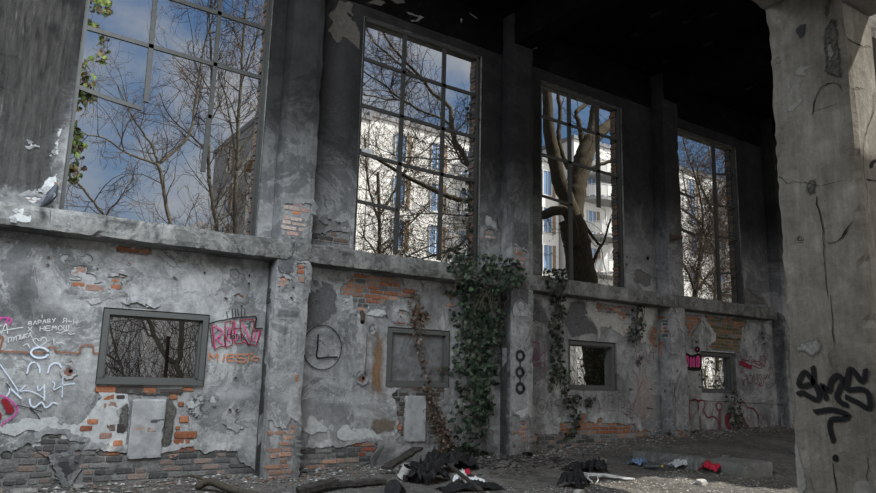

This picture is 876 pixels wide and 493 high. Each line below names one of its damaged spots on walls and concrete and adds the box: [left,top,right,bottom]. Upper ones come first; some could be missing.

flaking render [328,0,360,49]
spalling [824,0,842,78]
peeling [513,222,532,274]
crack [774,82,876,371]
flaking render [266,257,423,335]
peeling [512,286,669,359]
flaking render [685,311,772,358]
flaking render [0,386,470,493]